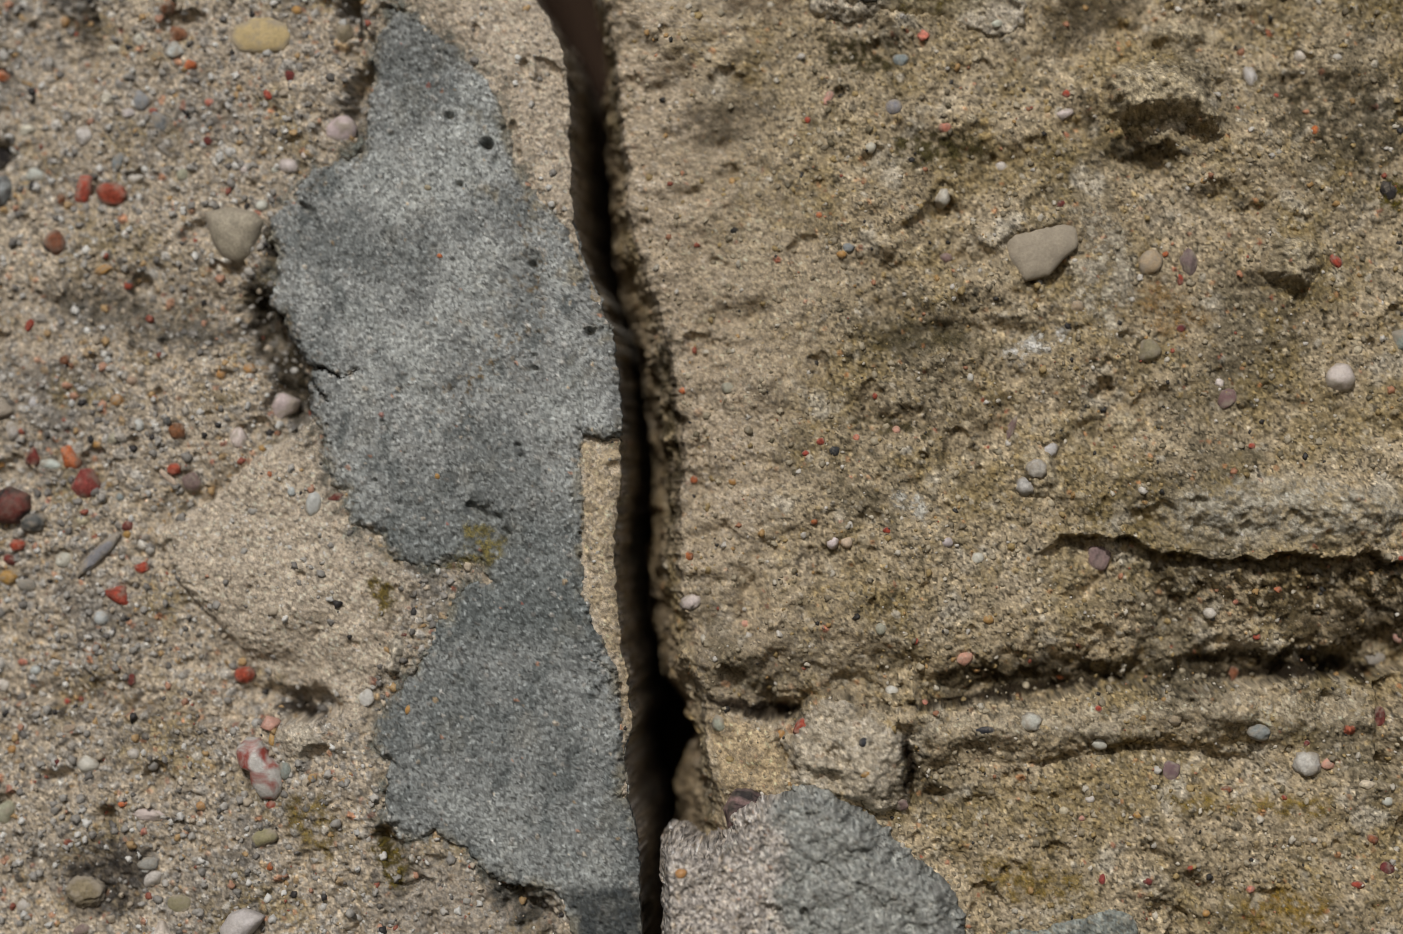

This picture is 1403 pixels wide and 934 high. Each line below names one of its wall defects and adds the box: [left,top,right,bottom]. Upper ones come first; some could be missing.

crack [356,9,364,38]
crack [538,0,624,304]
crack [275,700,327,717]
crack [644,444,801,823]
crack [902,675,1115,791]
crack [1191,655,1373,683]